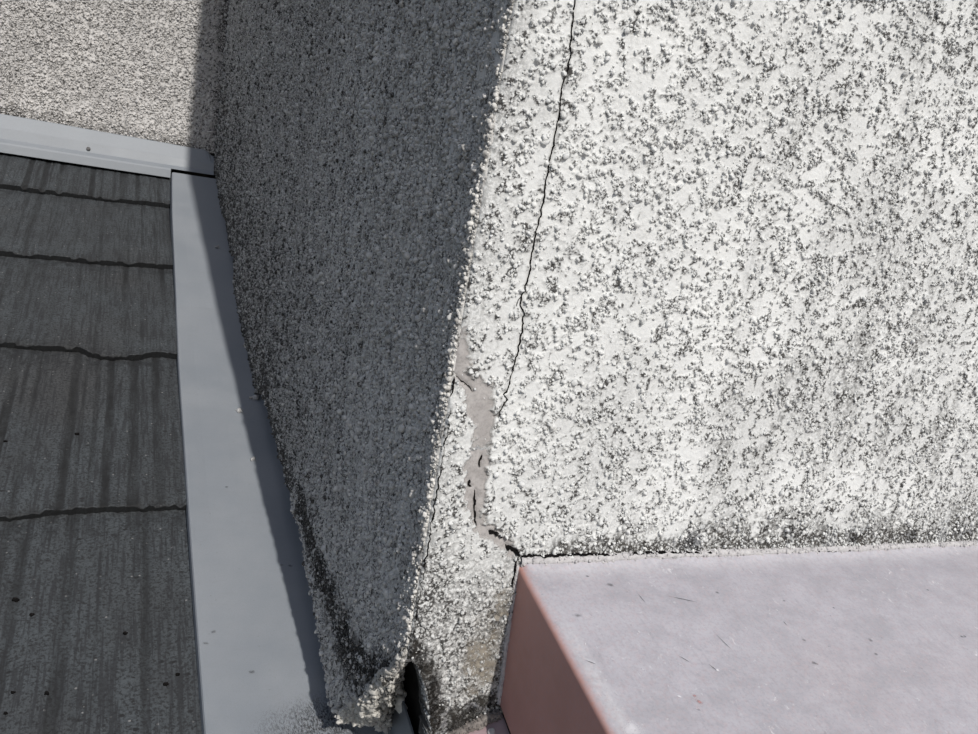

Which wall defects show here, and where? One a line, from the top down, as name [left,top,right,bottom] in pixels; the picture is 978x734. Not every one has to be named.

crack [498,0,576,418]
crack [413,376,472,635]
spalling [454,326,519,558]
water stain [407,582,516,734]